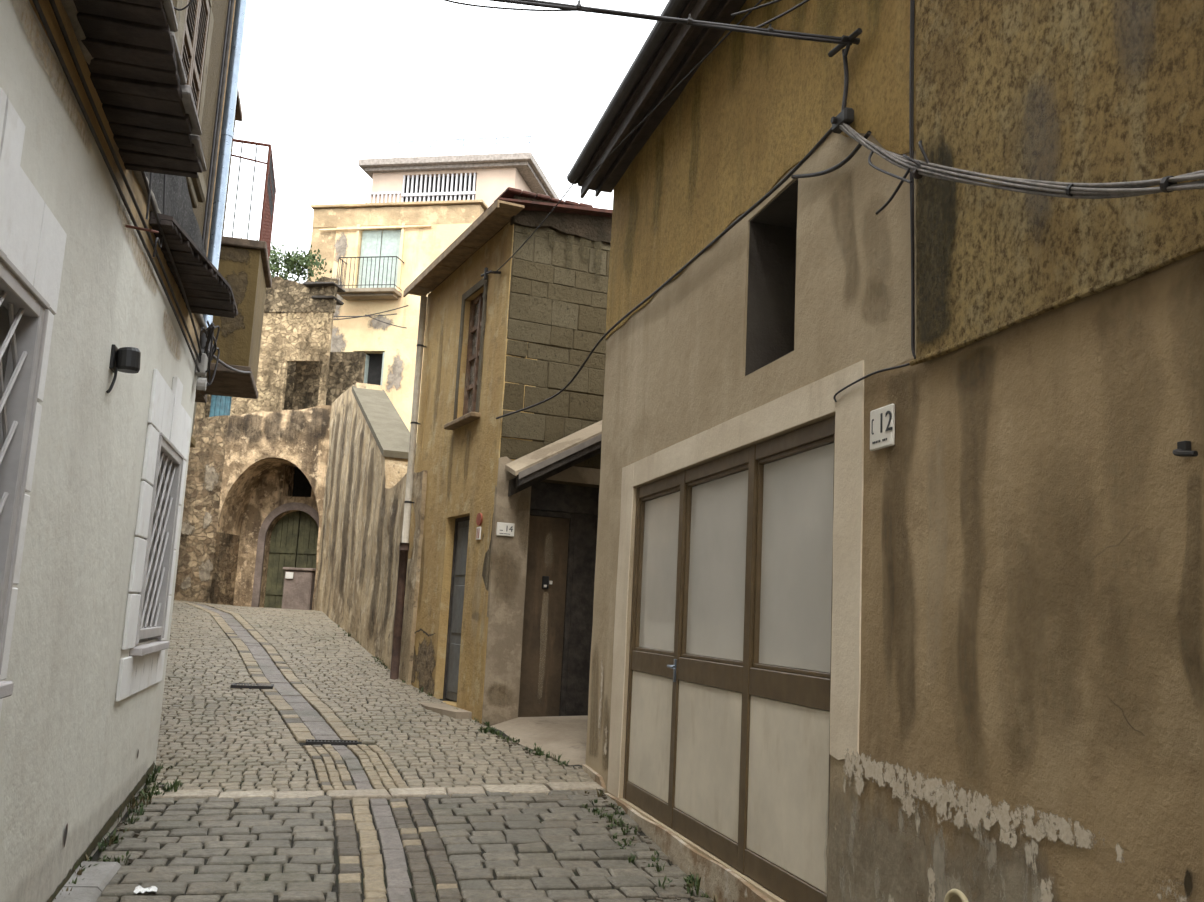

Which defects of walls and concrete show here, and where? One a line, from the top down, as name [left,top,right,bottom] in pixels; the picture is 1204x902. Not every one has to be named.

leakage [915,144,956,343]
peeling [826,749,1095,902]